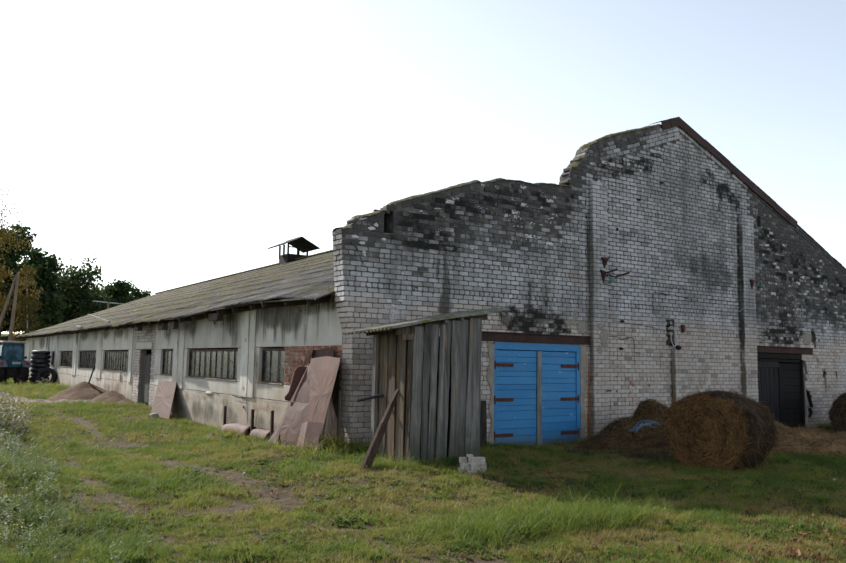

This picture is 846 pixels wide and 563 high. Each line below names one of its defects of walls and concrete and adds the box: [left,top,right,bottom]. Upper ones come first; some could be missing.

leakage [701,168,741,212]
spalling [351,216,378,256]
spalling [409,196,464,241]
spalling [470,182,574,250]
spalling [759,231,844,320]
leakage [256,296,335,340]
leakage [494,287,571,335]